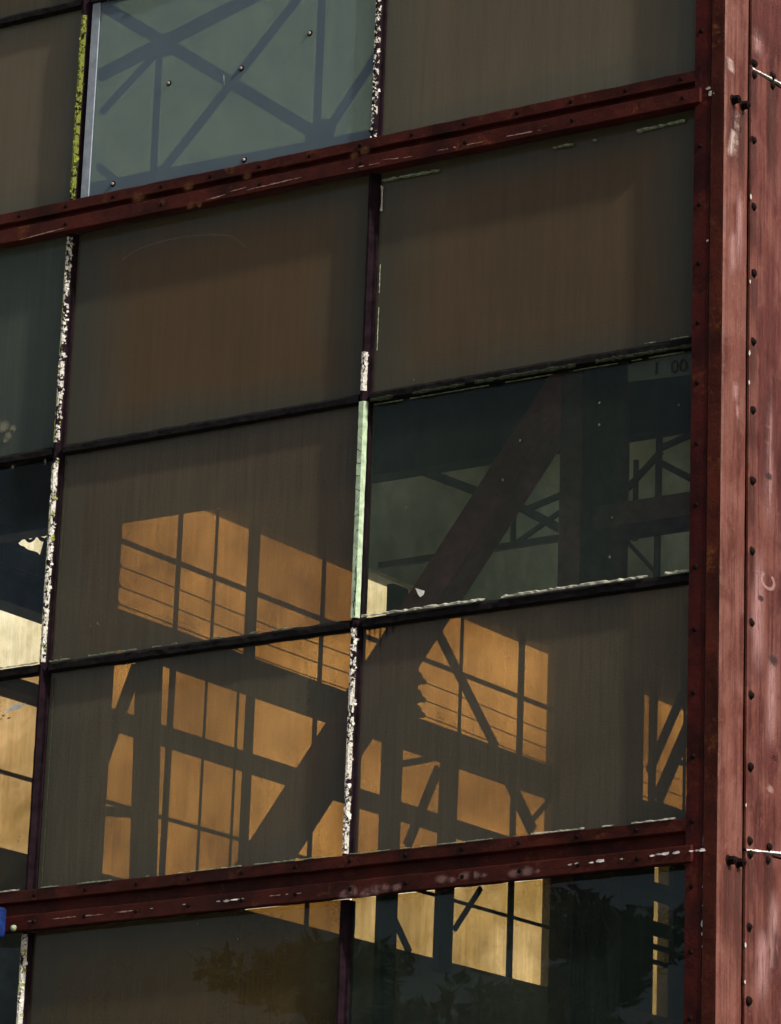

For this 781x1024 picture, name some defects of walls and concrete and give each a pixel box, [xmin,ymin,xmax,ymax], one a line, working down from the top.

peeling [370,0,382,138]
corrosion [730,103,745,163]
peeling [54,236,74,442]
peeling [360,352,369,391]
peeling [39,458,59,662]
peeling [342,628,359,854]